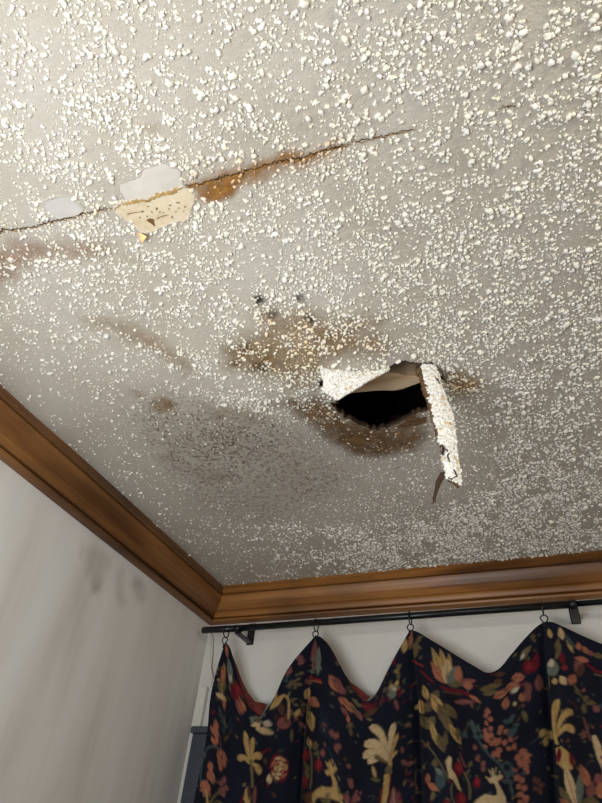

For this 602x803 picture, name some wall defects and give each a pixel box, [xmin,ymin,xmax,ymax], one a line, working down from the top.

corrosion [198,153,297,200]
crack [183,129,414,189]
crack [0,207,113,234]
peeling [0,0,602,585]
damp [232,315,338,379]
damp [454,376,475,390]
damp [289,400,423,456]